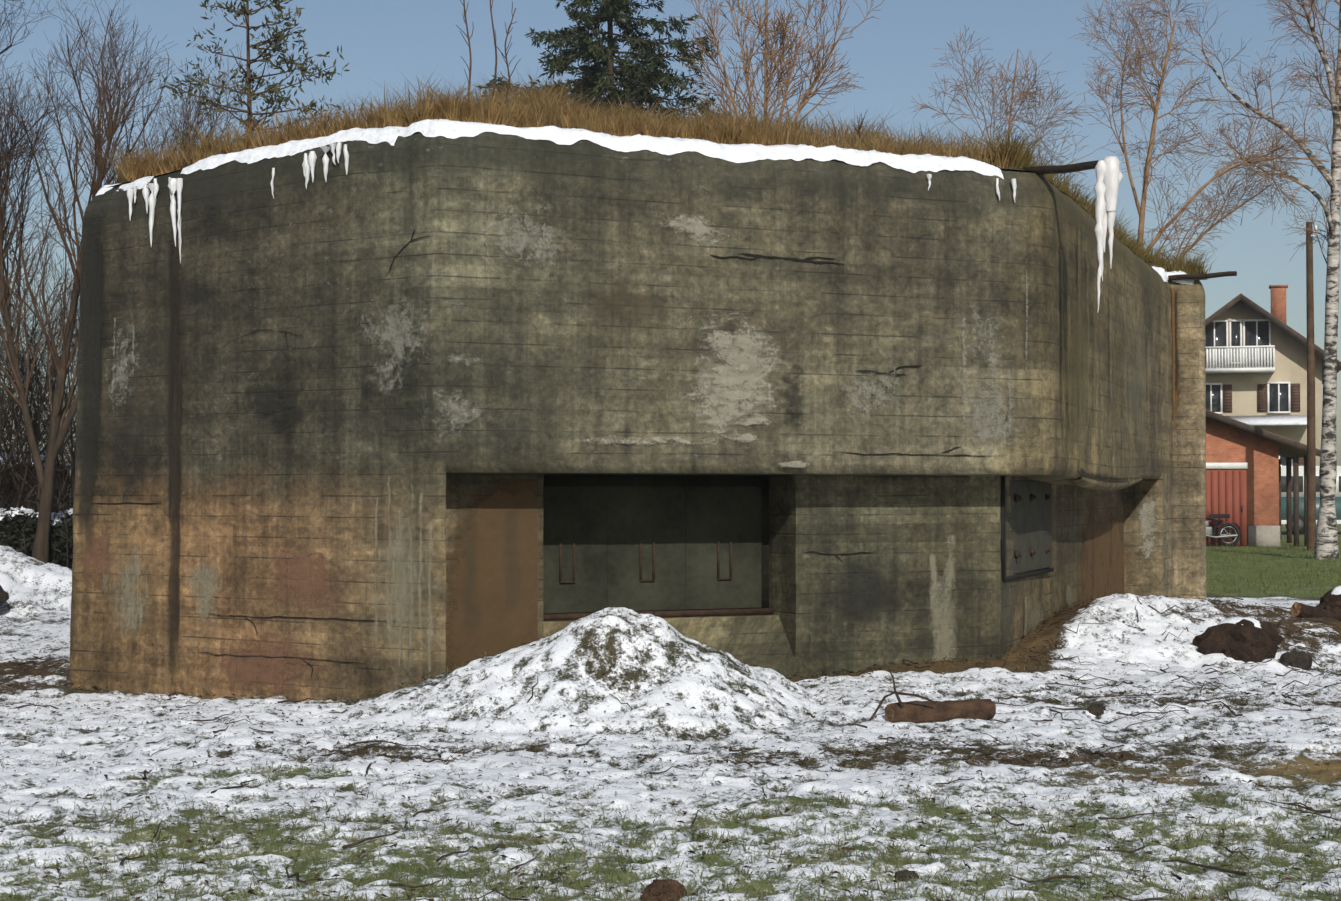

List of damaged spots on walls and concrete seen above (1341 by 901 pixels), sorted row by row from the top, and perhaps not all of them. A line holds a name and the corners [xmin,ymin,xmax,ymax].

crack [708,253,845,265]
peeling [682,318,792,444]
leakage [930,535,956,661]